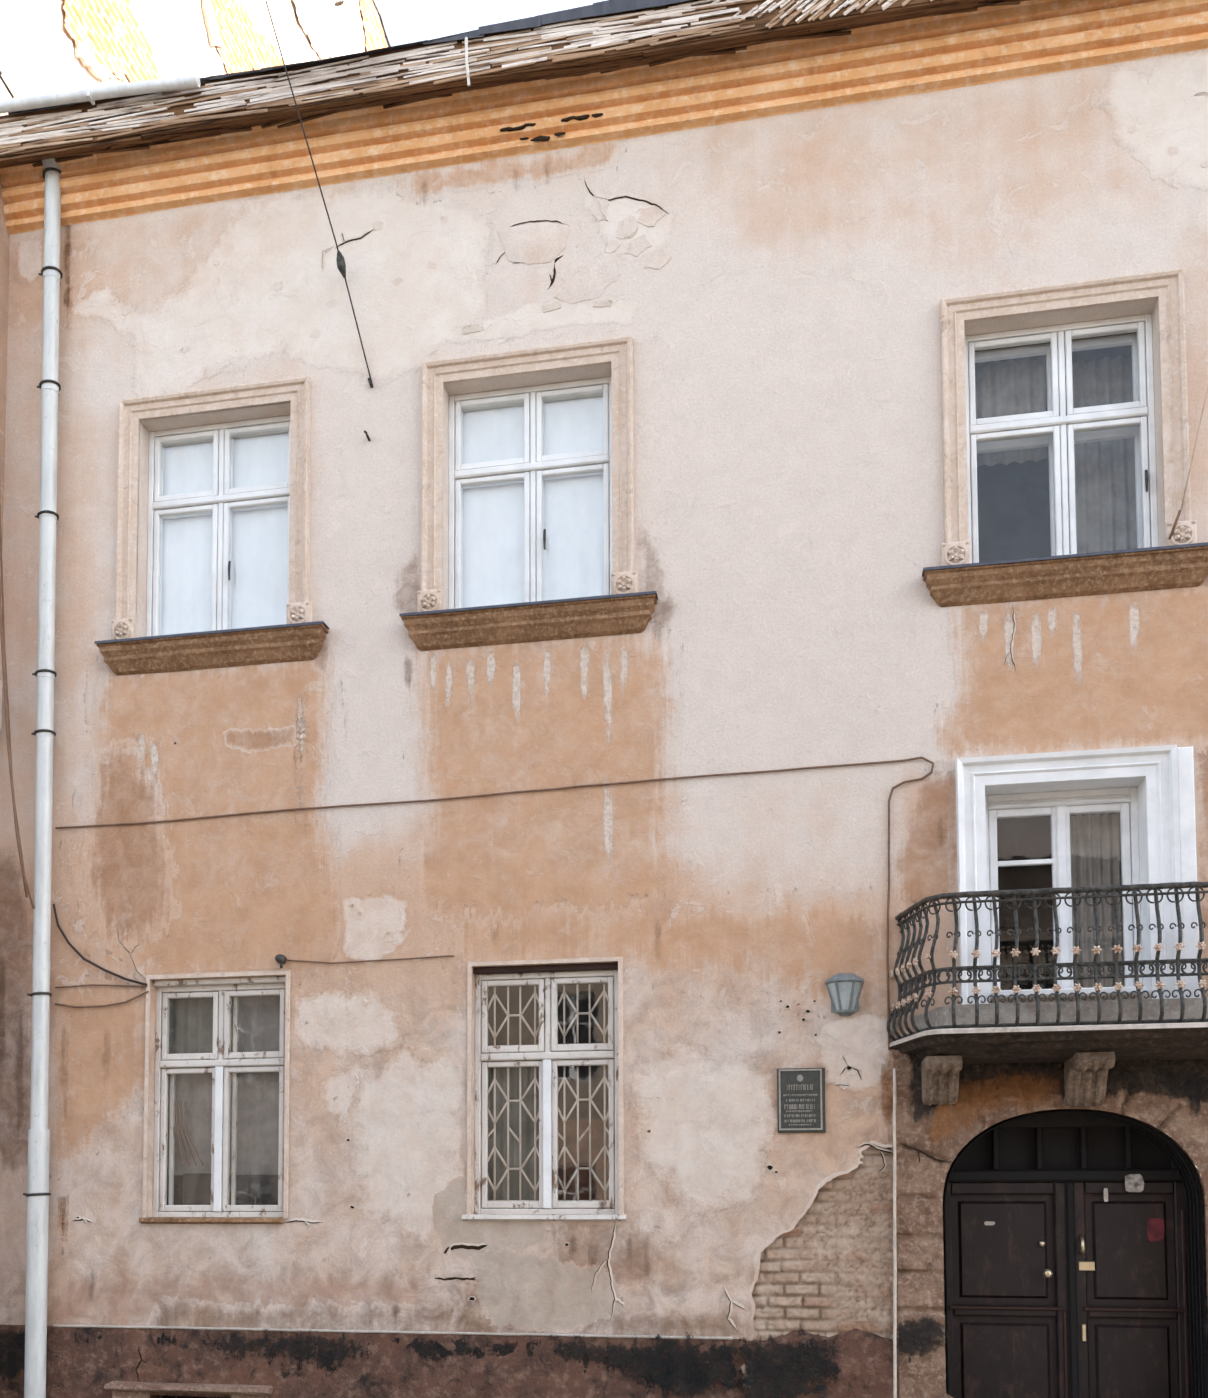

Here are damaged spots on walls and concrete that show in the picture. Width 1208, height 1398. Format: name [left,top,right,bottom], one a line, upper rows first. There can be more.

crack [322,229,374,271]
peeling [69,179,640,398]
flaking render [582,189,677,269]
water stain [391,521,1208,1018]
water stain [0,840,34,1181]
water stain [48,617,353,1179]
peeling [341,892,409,965]
peeling [295,983,466,1250]
water stain [0,1331,25,1381]
water stain [47,1213,759,1398]
crack [591,1221,625,1321]
flaking render [748,1140,898,1346]